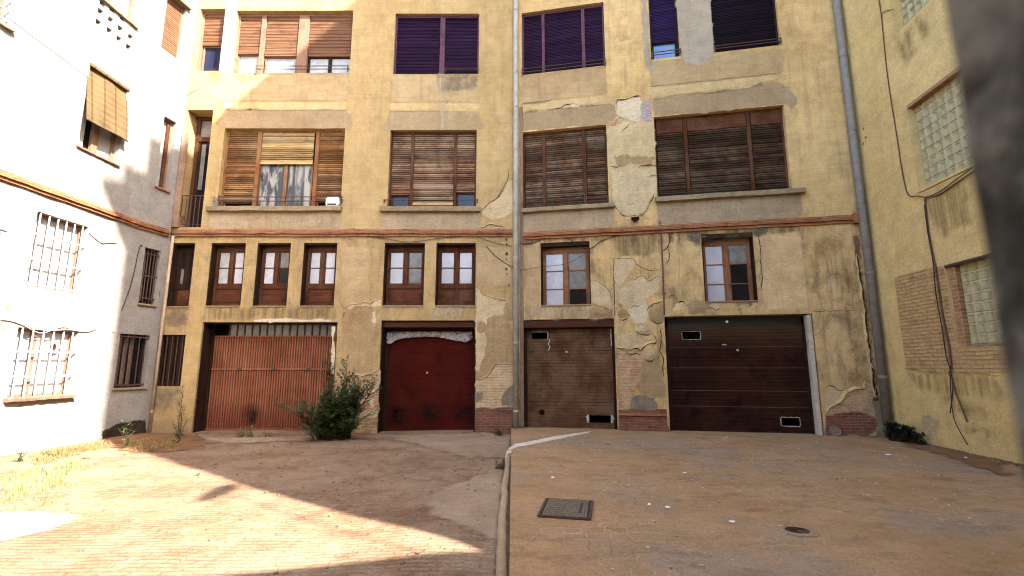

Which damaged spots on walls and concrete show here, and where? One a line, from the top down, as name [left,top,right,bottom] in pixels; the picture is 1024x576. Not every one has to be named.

peeling [675,0,715,66]
peeling [605,94,657,219]
flaking render [474,180,513,435]
flaking render [591,255,669,432]
crack [812,254,879,402]
flaking render [824,380,885,437]